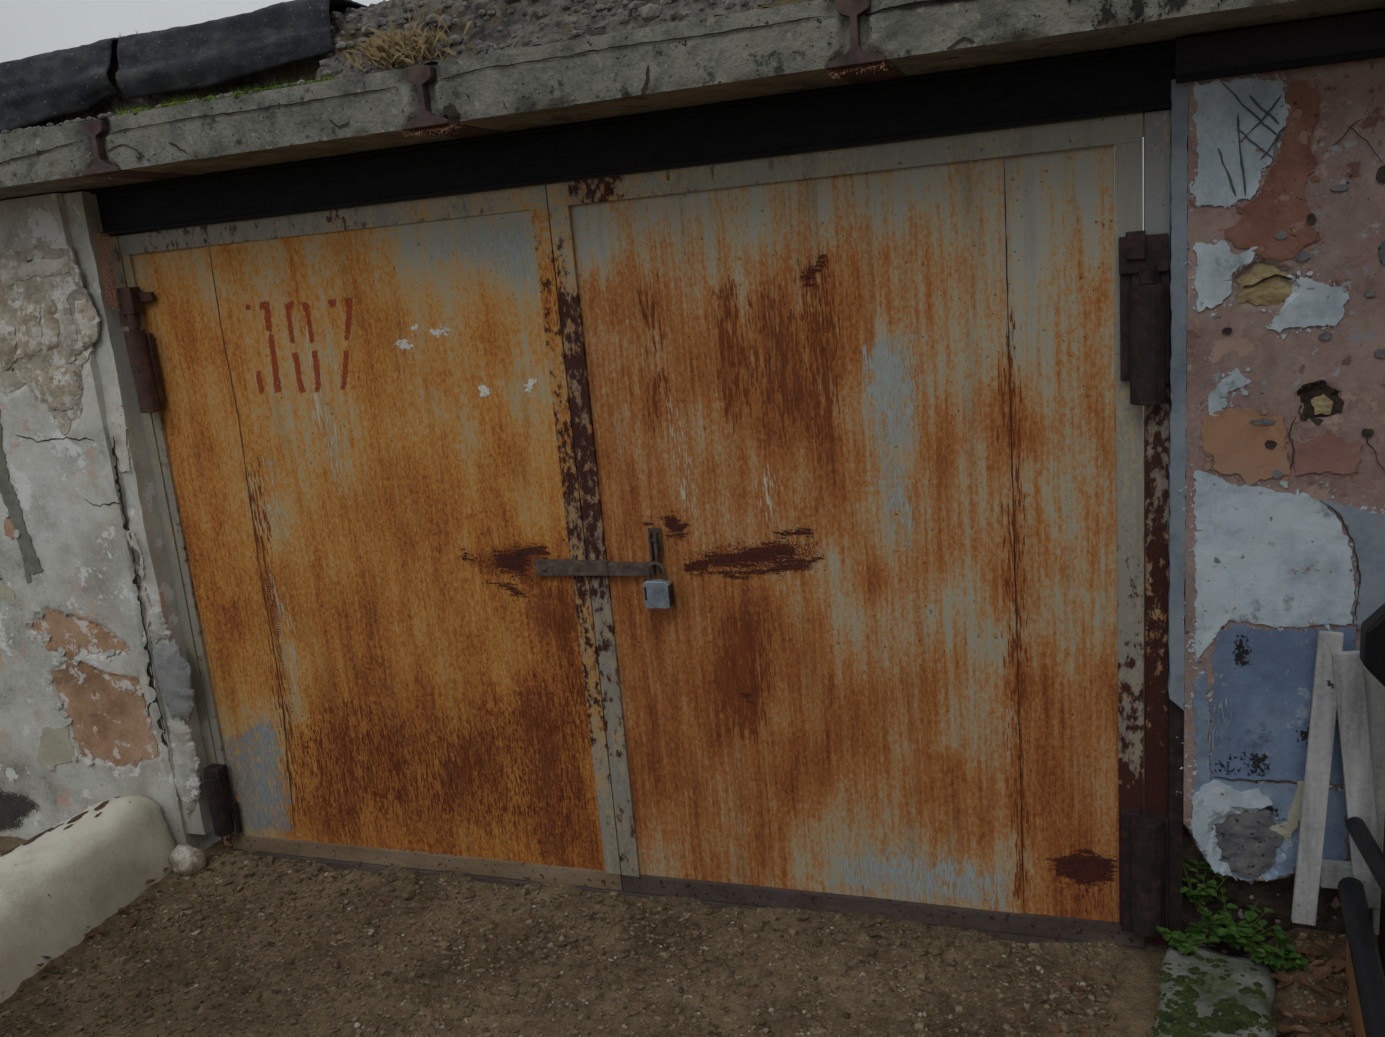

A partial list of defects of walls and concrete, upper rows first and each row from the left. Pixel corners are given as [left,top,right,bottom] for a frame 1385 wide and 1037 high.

crack [438,16,828,121]
crack [865,0,967,16]
crack [946,37,975,49]
peeling [1178,72,1364,350]
flaking render [0,246,101,436]
rust [710,252,846,466]
peeling [0,574,167,779]
crack [0,409,171,766]
rust [242,457,603,868]
rust [642,511,827,584]
rust [994,306,1119,917]
peeling [1167,359,1385,956]